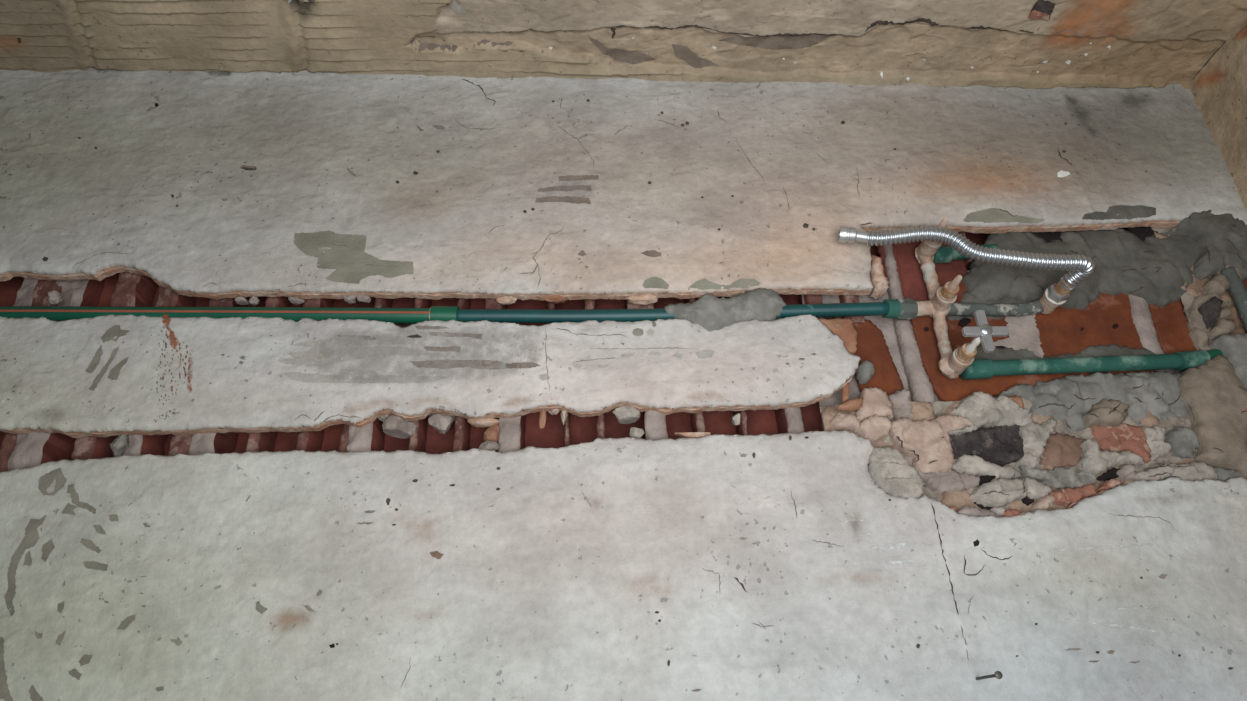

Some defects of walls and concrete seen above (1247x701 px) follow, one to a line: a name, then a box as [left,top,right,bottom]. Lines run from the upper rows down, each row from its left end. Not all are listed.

corrosion [156,315,192,405]